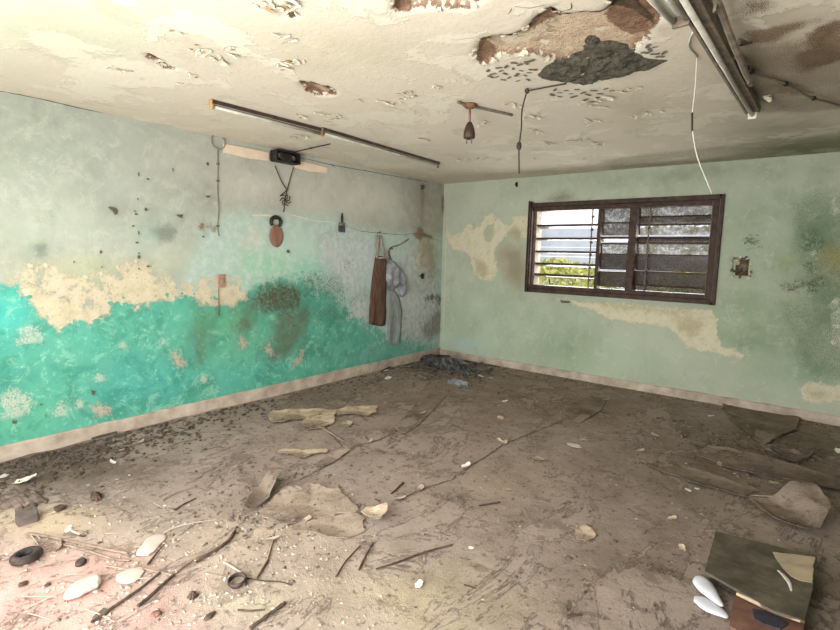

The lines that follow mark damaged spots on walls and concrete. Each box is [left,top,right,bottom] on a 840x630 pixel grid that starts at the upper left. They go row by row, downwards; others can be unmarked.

spalling [299,80,336,96]
spalling [389,0,479,13]
spalling [468,0,661,67]
damp [730,0,840,114]
peeling [446,213,528,282]
peeling [6,223,247,348]
damp [184,225,375,369]
peeling [556,298,745,360]
peeling [798,380,840,405]